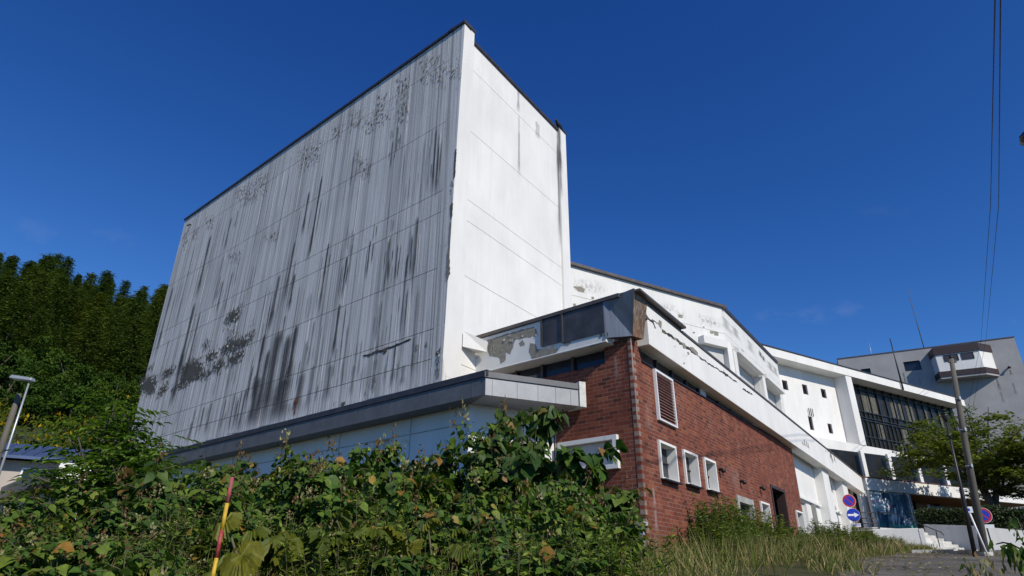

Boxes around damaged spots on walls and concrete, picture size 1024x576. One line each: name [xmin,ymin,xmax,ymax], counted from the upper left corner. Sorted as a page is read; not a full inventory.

damp [429,132,442,183]
damp [365,113,420,356]
damp [154,150,373,435]
crack [363,339,427,357]
peeling [487,327,570,364]
crack [646,315,753,395]